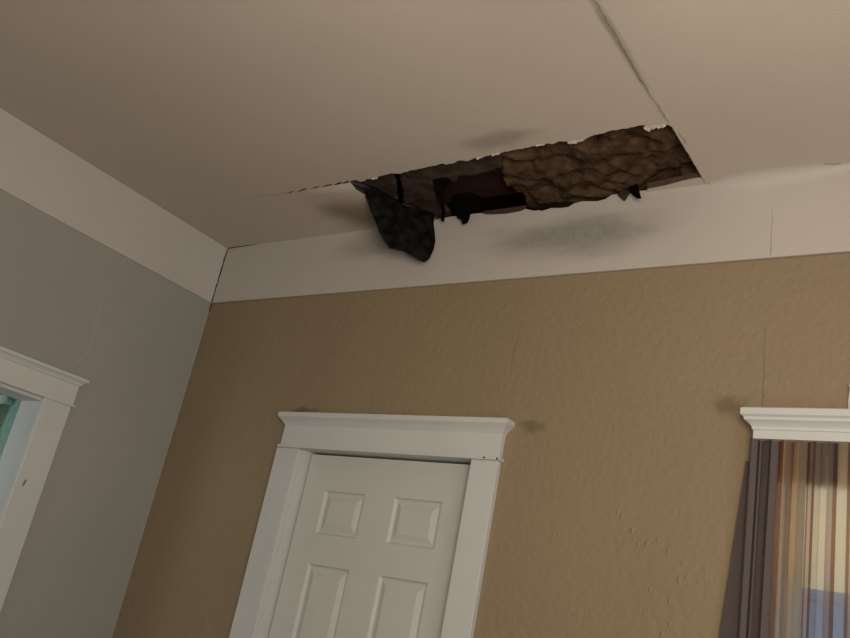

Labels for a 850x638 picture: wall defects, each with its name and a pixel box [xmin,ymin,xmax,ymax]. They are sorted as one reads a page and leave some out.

crack [593,0,705,183]
crack [248,181,349,198]
spalling [492,124,697,211]